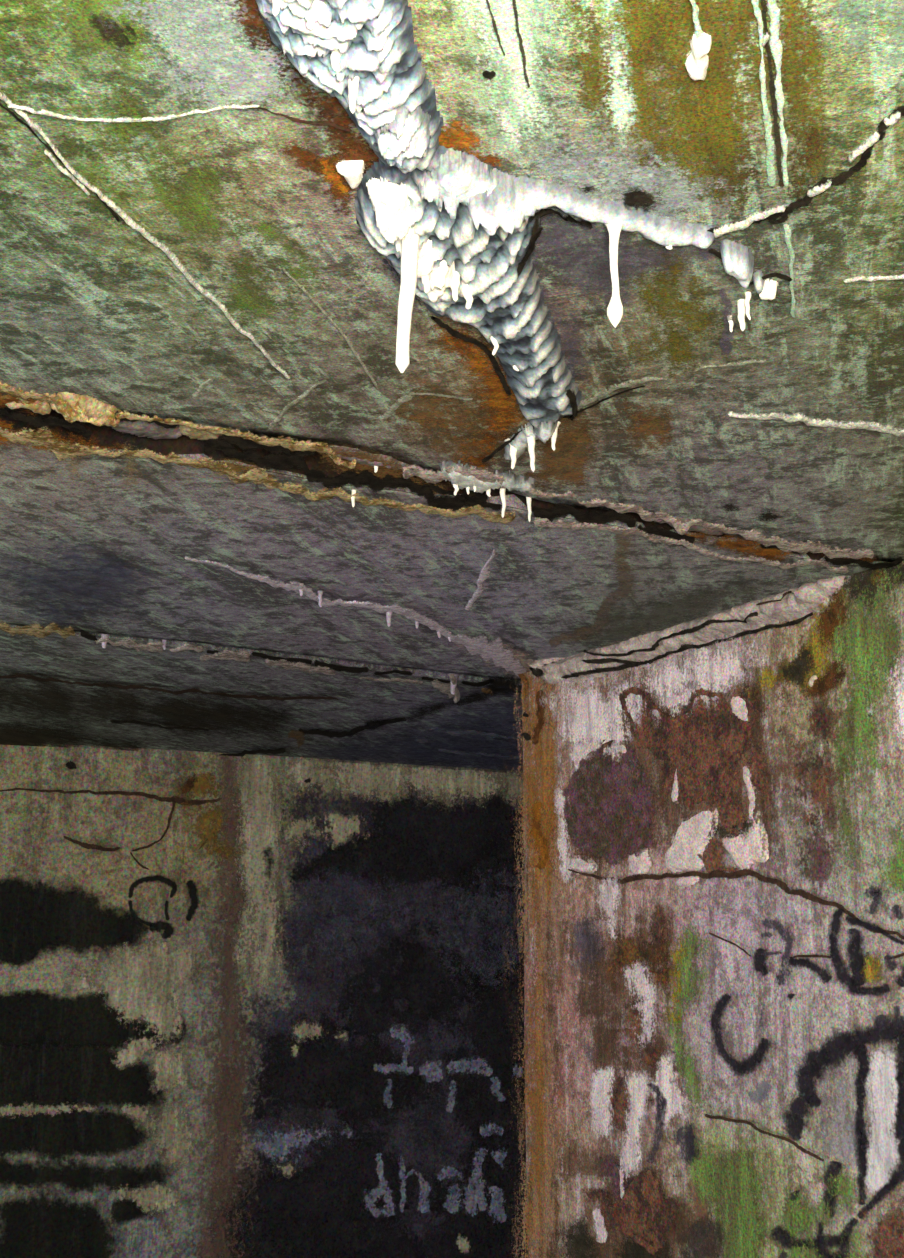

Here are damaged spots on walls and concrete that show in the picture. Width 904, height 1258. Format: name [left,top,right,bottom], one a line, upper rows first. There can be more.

crack [0,103,352,222]
corrosion [227,0,379,215]
corrosion [438,120,501,167]
crack [486,0,530,88]
damp [452,0,717,220]
damp [533,206,725,380]
crack [707,106,904,355]
damp [0,673,292,751]
crack [561,591,813,679]
damp [0,752,257,1258]
corrosion [514,671,567,1258]
crack [568,869,904,960]